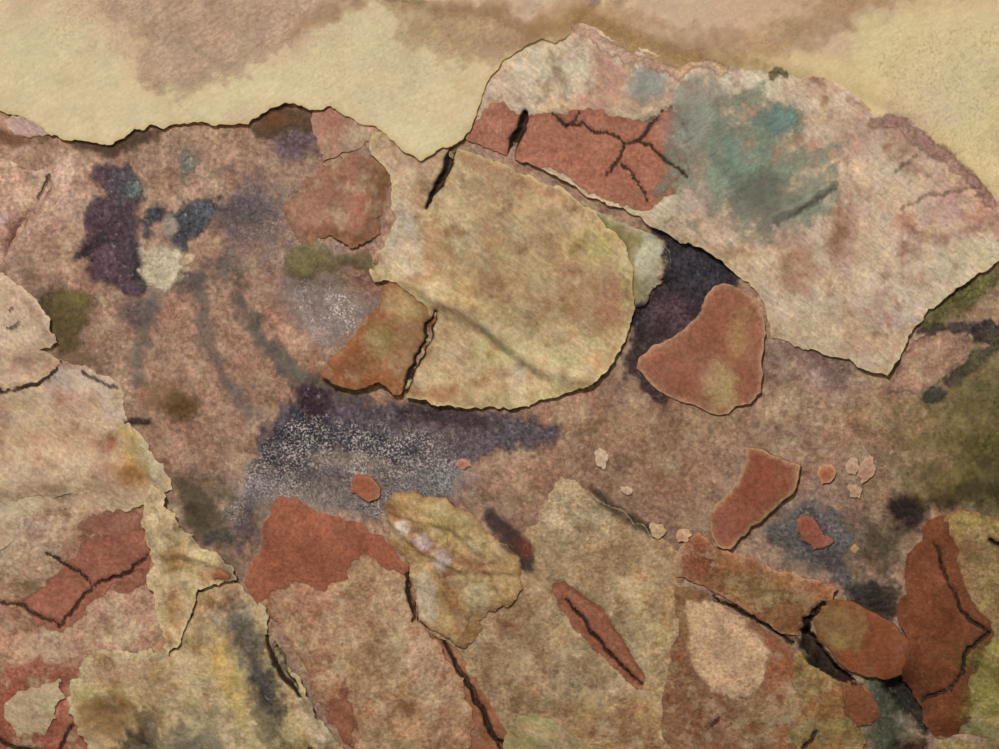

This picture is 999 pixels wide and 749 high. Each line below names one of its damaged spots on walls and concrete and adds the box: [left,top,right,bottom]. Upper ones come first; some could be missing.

crack [425,145,455,209]
peeling [0,0,999,415]
crack [507,110,528,155]
crack [552,109,688,201]
crack [403,310,437,393]
leakage [916,319,999,404]
flaking render [0,159,176,749]
crack [0,552,148,628]
crack [405,572,416,622]
crack [565,598,643,685]
crack [712,594,853,681]
crack [442,641,503,749]